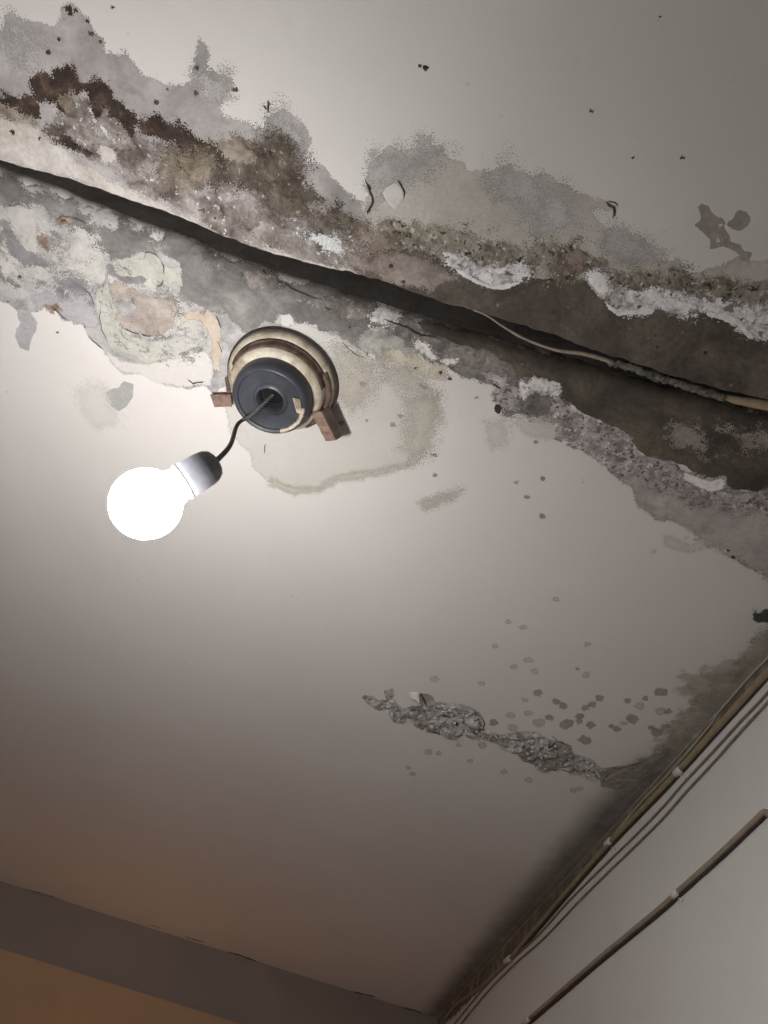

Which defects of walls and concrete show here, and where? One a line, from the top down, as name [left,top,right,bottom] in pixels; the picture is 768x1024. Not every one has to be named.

leakage [0,1,768,342]
crack [0,160,768,414]
peeling [0,91,768,493]
leakage [160,229,768,581]
leakage [429,609,768,1024]